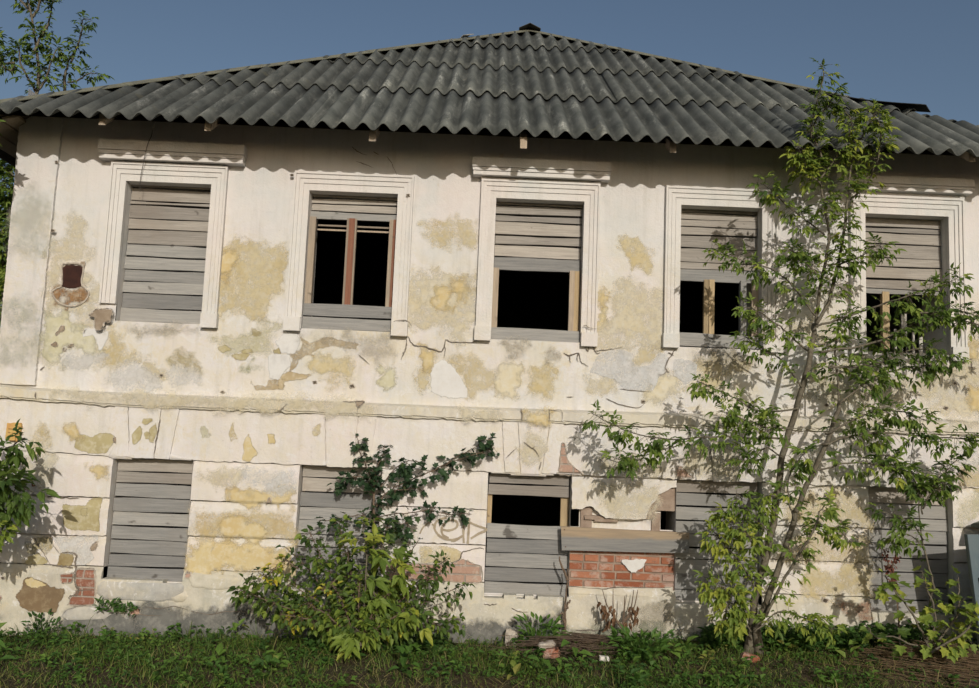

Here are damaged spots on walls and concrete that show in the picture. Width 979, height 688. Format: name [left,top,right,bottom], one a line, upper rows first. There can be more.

peeling [40,217,201,379]
peeling [123,240,373,444]
peeling [408,267,477,342]
peeling [587,237,751,404]
peeling [20,426,56,492]
peeling [16,497,102,613]
peeling [63,422,116,479]
peeling [185,425,297,578]
peeling [414,343,559,465]
flaking render [556,431,584,477]
flaking render [569,551,674,590]